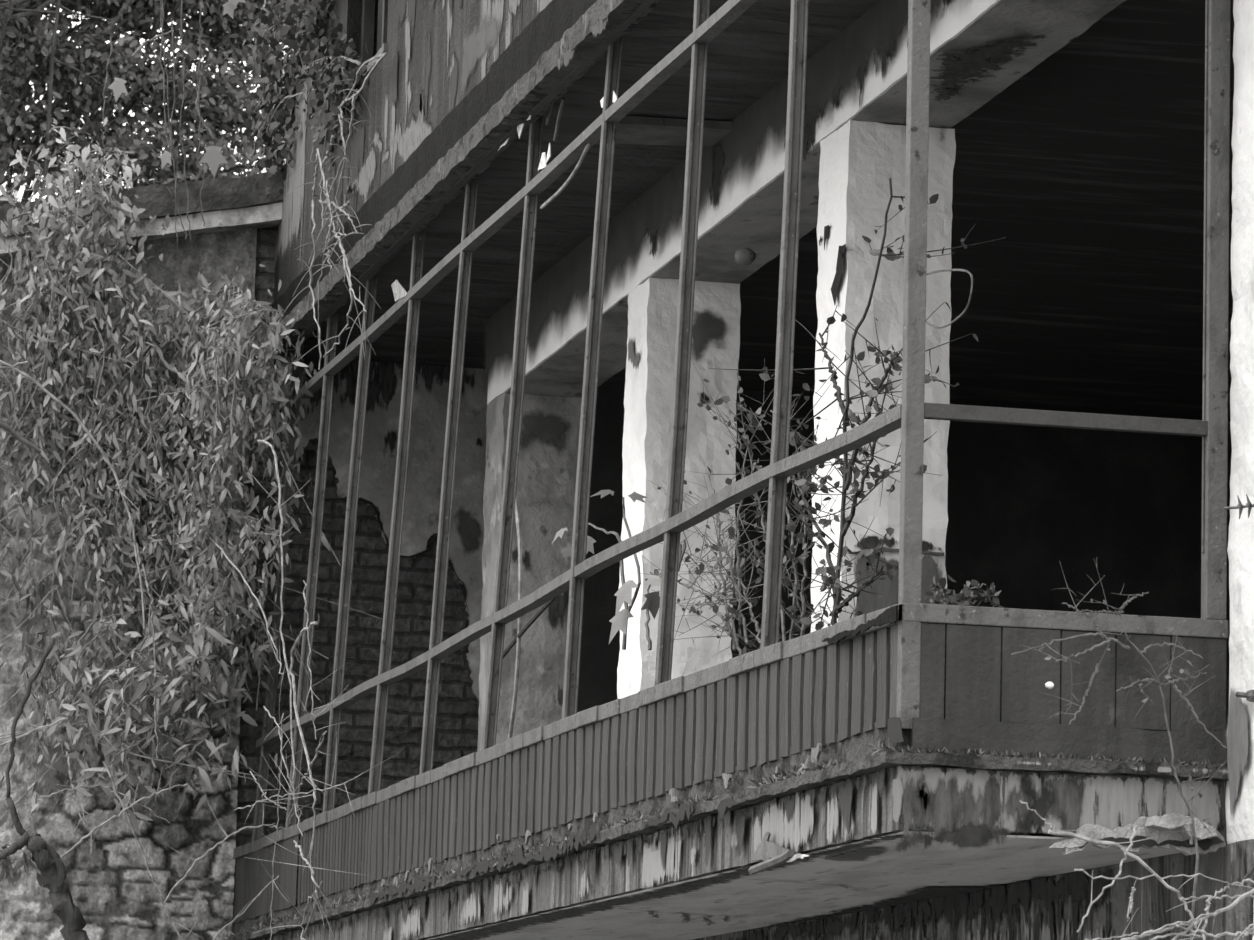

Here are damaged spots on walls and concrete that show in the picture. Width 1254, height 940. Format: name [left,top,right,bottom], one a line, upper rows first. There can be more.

peeling [509,0,520,19]
peeling [347,88,433,199]
damp [322,0,522,238]
damp [699,76,788,213]
damp [803,0,908,161]
damp [299,159,686,413]
damp [691,311,725,360]
damp [520,411,569,451]
spalling [281,497,476,783]
spalling [722,773,732,789]
spalling [811,743,822,763]
spalling [1049,812,1226,856]